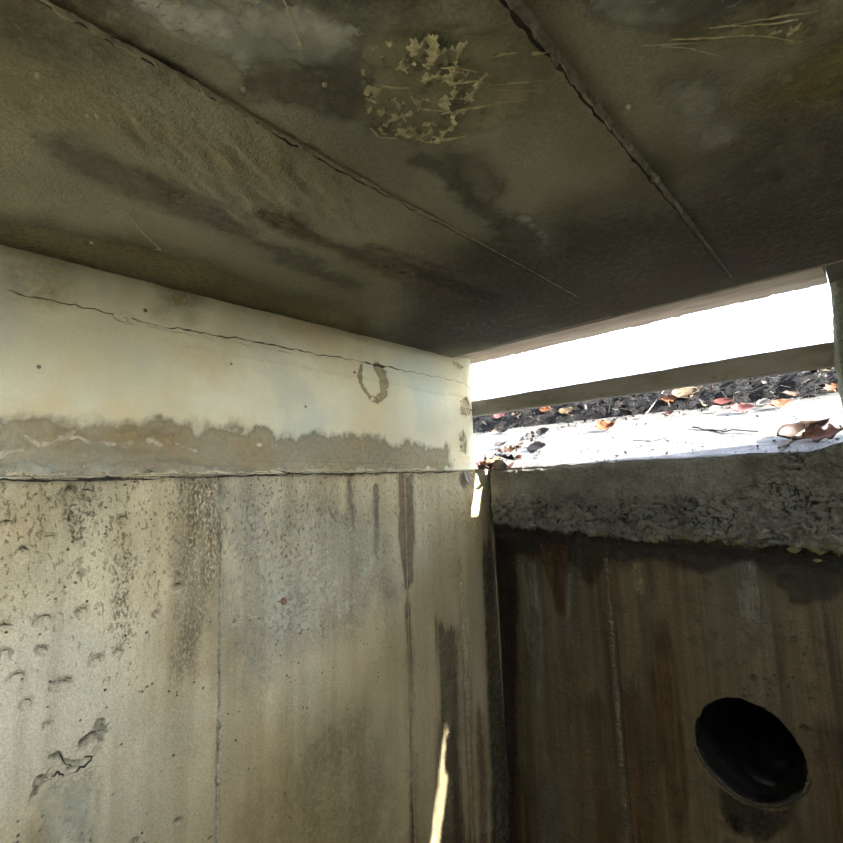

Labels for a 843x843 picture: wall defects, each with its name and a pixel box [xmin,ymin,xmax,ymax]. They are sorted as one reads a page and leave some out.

leakage [50,141,362,288]
crack [9,290,469,388]
peeling [358,362,391,403]
leakage [0,415,450,660]
leakage [497,528,842,726]
spalling [20,712,114,813]
leakage [435,564,474,843]
leakage [719,788,788,839]